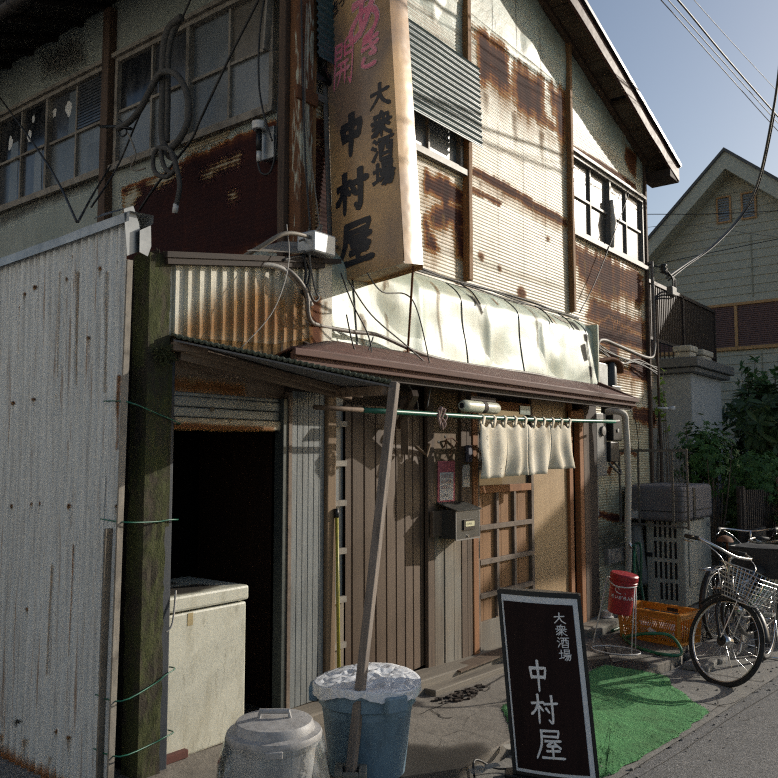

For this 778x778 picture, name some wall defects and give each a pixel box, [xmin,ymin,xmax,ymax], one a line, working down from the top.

corrosion [471,22,637,189]
corrosion [121,129,278,254]
corrosion [423,166,567,264]
corrosion [183,286,327,346]
corrosion [575,242,648,395]
corrosion [0,735,56,778]